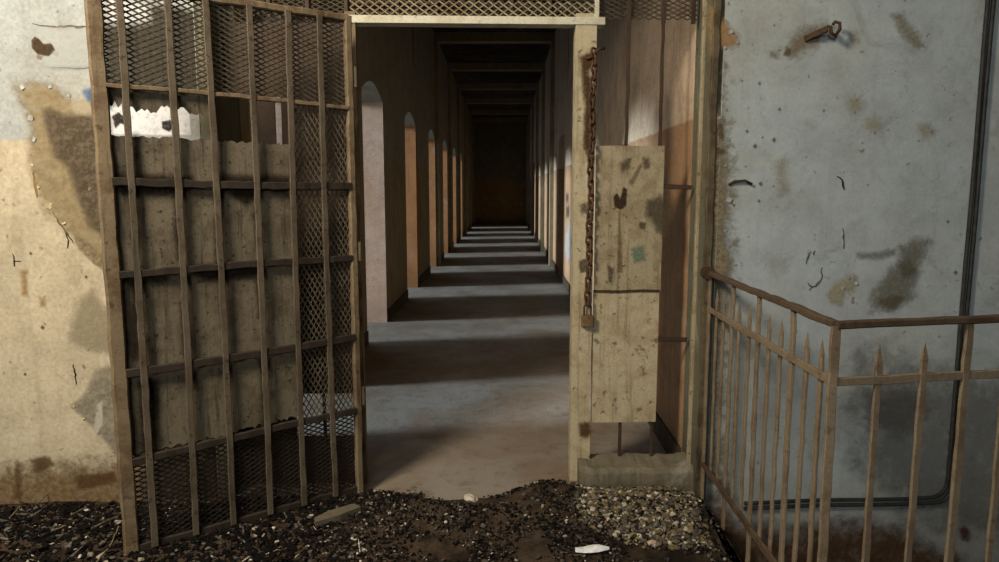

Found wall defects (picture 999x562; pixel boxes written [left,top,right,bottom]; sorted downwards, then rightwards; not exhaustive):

spalling [31,37,56,59]
damp [707,138,959,562]
damp [0,456,119,504]
damp [848,371,999,528]